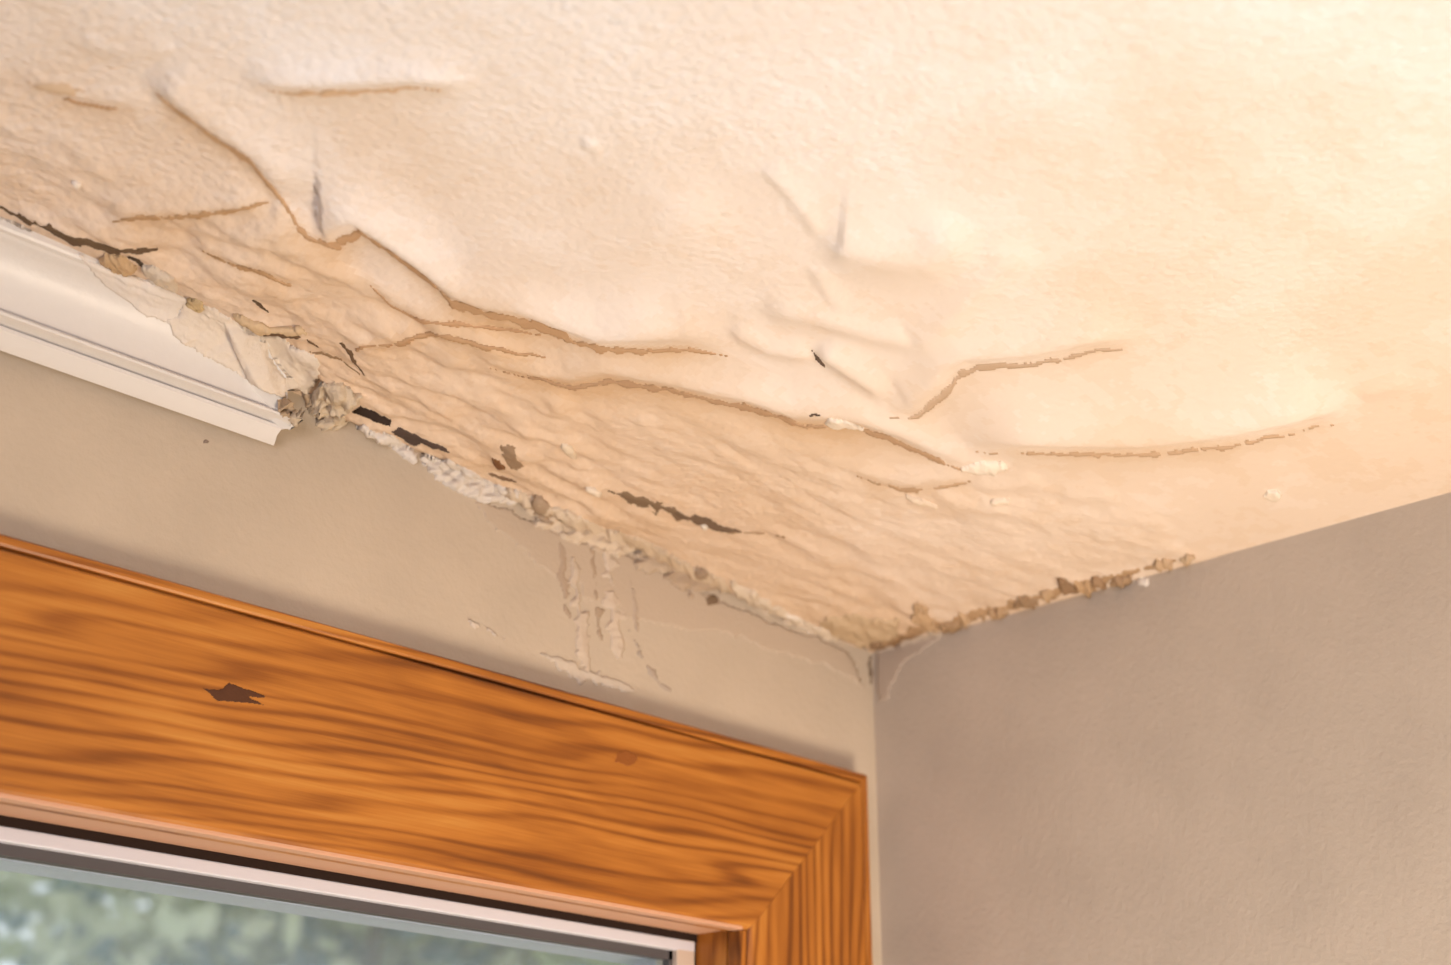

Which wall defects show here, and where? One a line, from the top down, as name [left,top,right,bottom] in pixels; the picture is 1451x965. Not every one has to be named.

crack [252,300,364,375]
flaking render [0,89,1216,653]
crack [488,473,516,483]
crack [607,490,785,539]
water stain [475,487,1154,703]